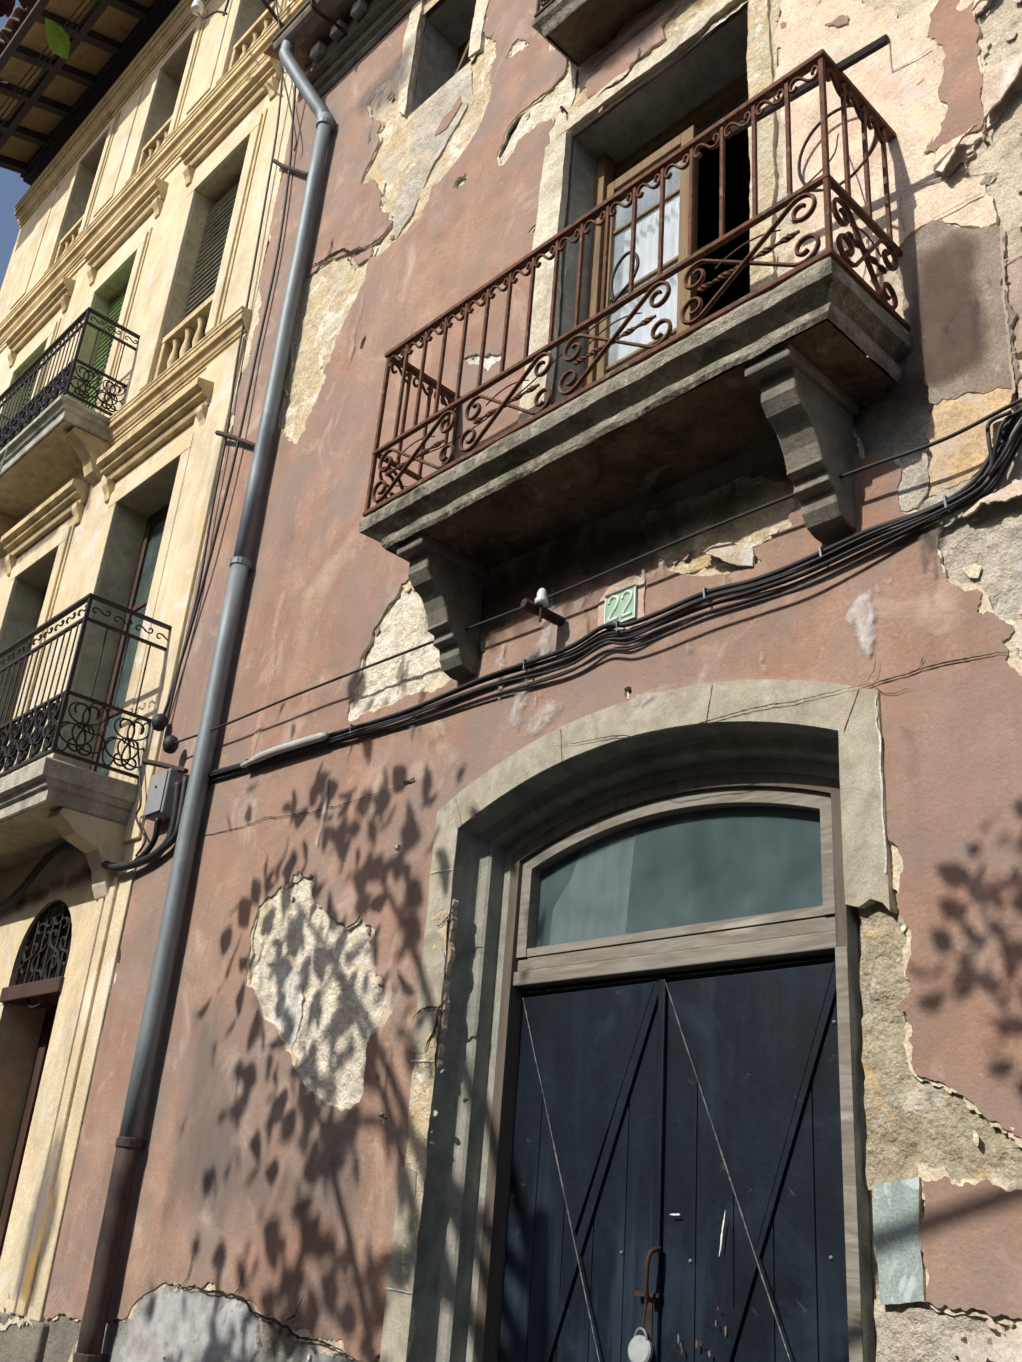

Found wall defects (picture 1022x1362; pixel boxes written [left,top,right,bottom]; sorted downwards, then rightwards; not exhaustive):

flaking render [282,0,528,441]
flaking render [500,0,749,164]
flaking render [774,108,798,278]
flaking render [877,264,910,333]
flaking render [925,0,1022,267]
flaking render [913,461,1022,622]
flaking render [348,584,444,723]
crack [559,650,1021,746]
flaking render [251,877,395,1109]
flaking render [858,890,1022,1190]
flaking render [120,1283,262,1362]
flaking render [874,1299,1017,1362]